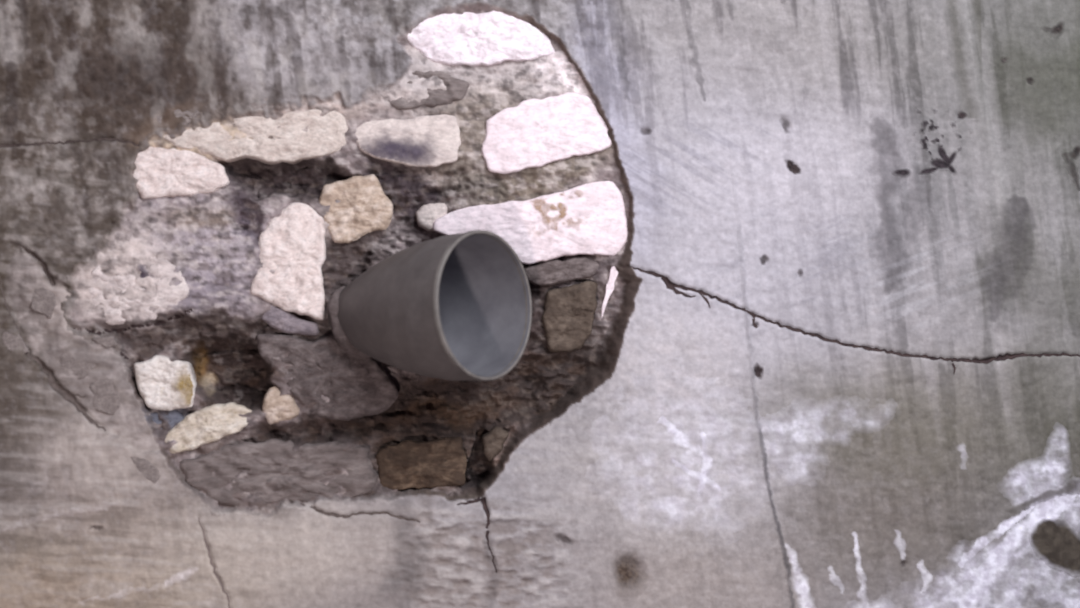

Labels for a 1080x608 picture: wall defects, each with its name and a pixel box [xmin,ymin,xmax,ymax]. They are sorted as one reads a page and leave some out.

crack [0,138,139,147]
flaking render [2,0,644,521]
crack [623,266,1080,374]
crack [457,497,497,573]
water stain [785,543,817,608]
water stain [827,422,1080,608]